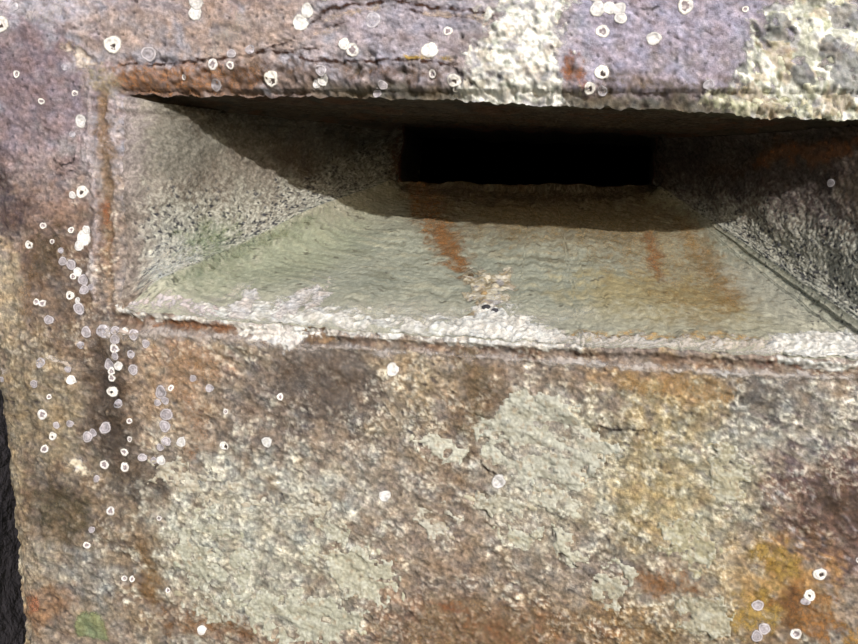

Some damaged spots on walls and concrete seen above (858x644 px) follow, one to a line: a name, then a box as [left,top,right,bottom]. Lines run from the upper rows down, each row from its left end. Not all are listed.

corrosion [111,58,270,97]
corrosion [407,181,467,277]
leakage [115,276,858,413]
corrosion [728,544,858,644]